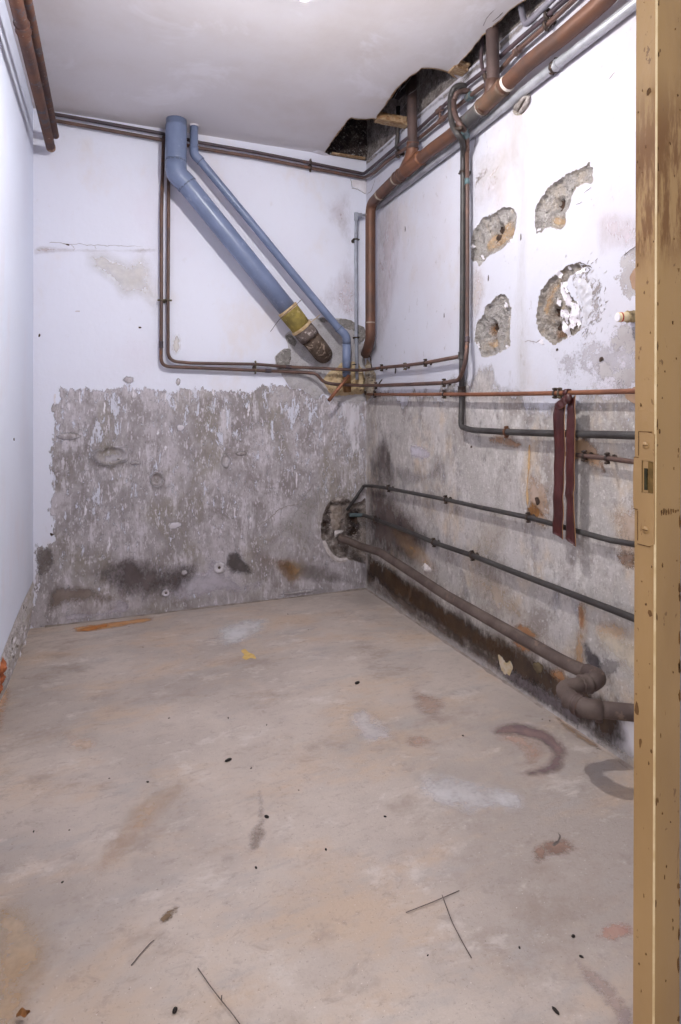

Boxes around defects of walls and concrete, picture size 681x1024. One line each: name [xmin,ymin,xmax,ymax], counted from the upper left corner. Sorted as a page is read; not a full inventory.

spalling [325,0,526,152]
spalling [471,207,517,267]
spalling [535,162,593,234]
peeling [0,247,658,767]
leakage [101,553,252,614]
leakage [367,492,635,755]